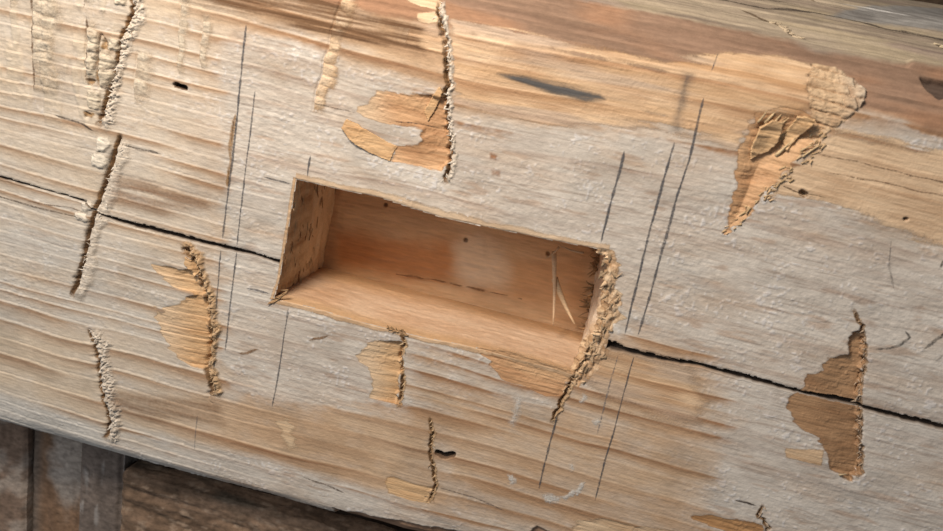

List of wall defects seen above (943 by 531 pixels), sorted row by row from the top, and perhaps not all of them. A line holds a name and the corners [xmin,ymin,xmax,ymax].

peeling [341,119,398,161]
crack [0,174,281,266]
crack [606,338,943,432]
spalling [571,518,638,531]